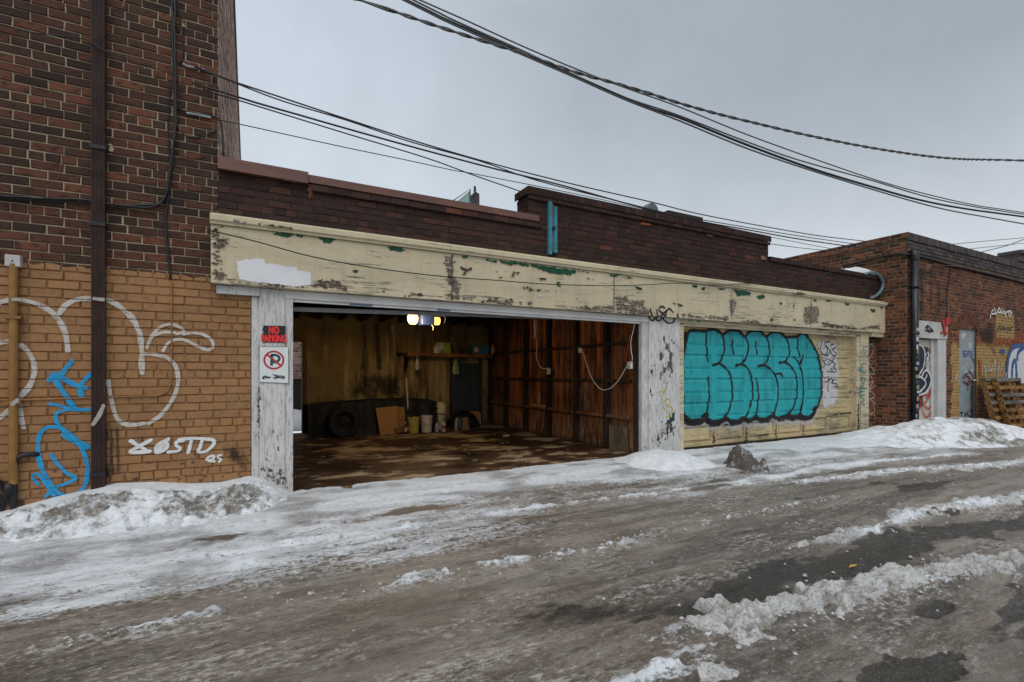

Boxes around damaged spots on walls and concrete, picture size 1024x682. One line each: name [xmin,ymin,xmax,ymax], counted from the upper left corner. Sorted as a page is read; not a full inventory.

peeling [210,219,347,291]
peeling [443,253,593,306]
peeling [565,274,650,316]
peeling [673,288,879,330]
peeling [649,335,675,406]
peeling [654,412,675,447]
peeling [257,465,288,489]